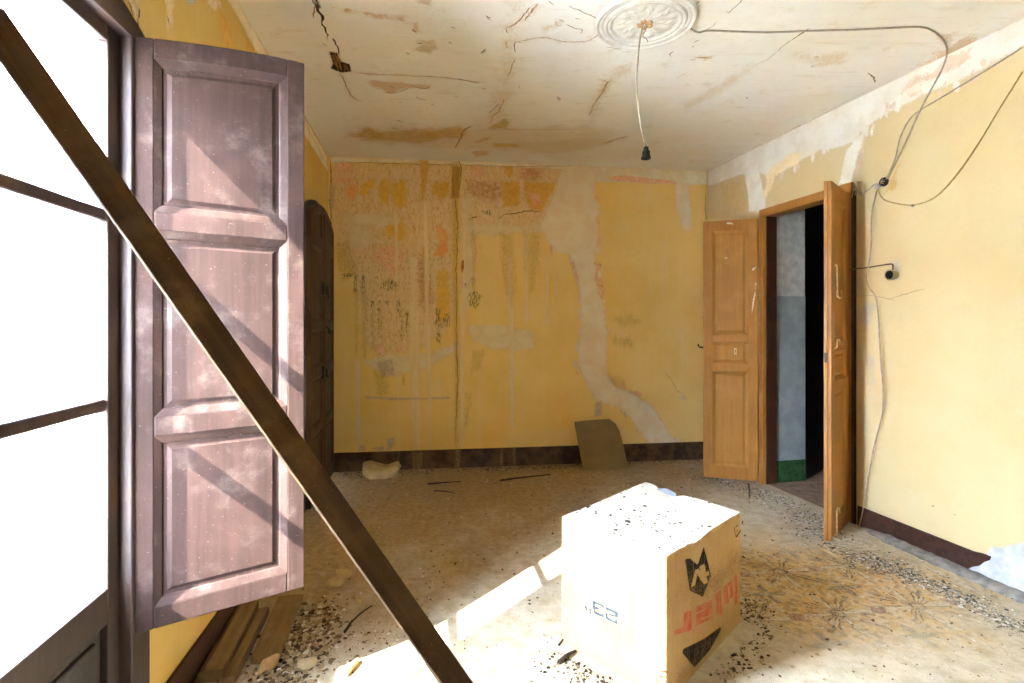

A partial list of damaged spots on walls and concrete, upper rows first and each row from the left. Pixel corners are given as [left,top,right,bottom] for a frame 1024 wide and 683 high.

peeling [227,0,268,55]
crack [312,0,627,147]
peeling [707,18,1024,186]
peeling [304,117,562,355]
damp [334,0,643,470]
spalling [969,541,1024,592]